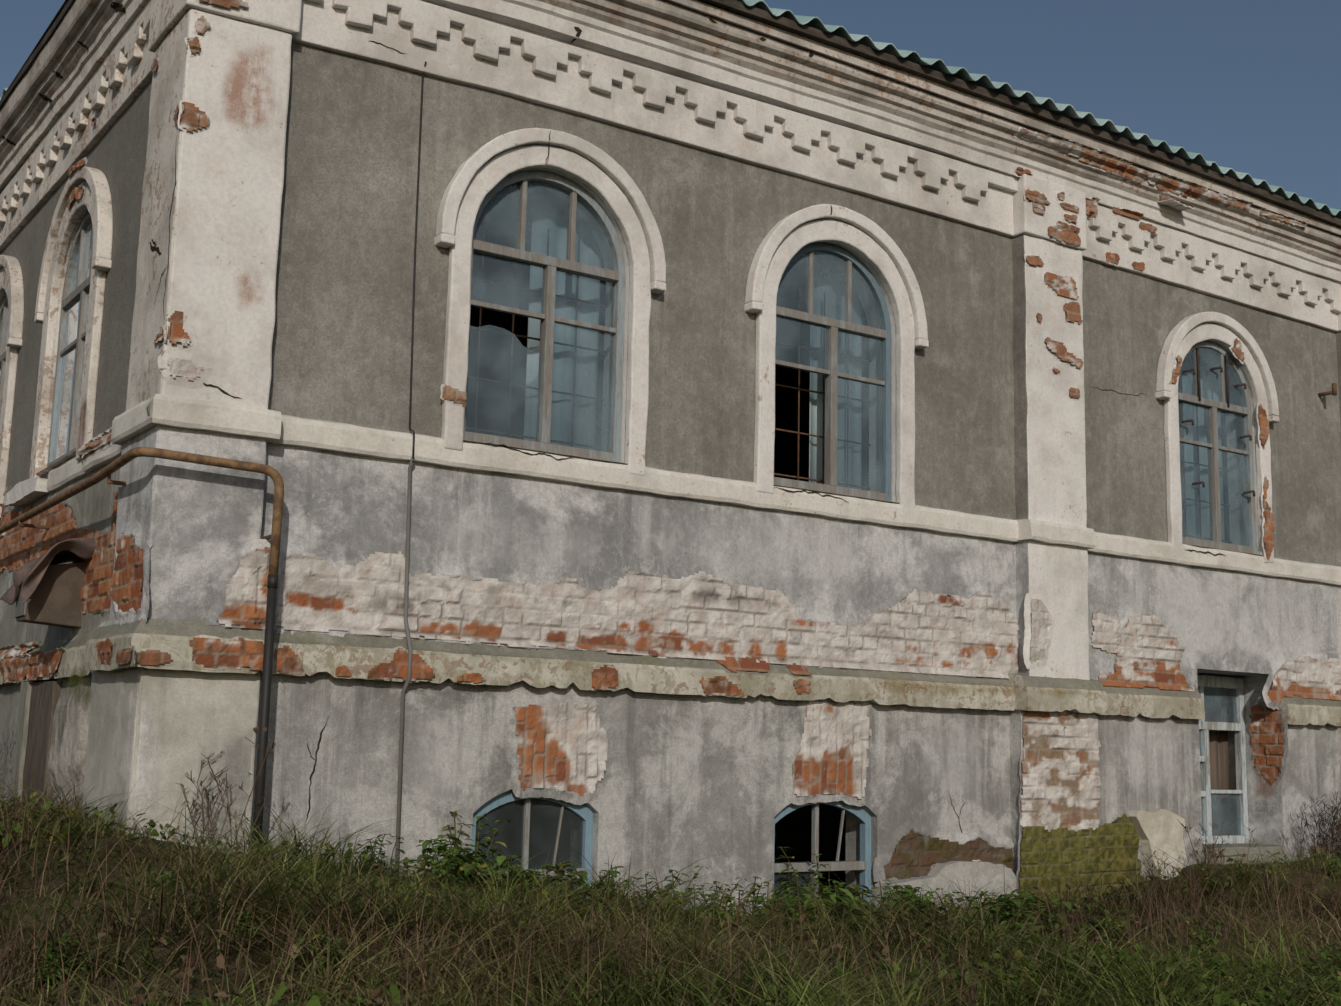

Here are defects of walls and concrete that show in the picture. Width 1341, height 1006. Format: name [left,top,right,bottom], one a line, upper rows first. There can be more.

peeling [173,100,210,134]
crack [149,148,176,313]
peeling [1014,166,1157,248]
flaking render [1014,127,1308,231]
peeling [1024,254,1083,324]
flaking render [0,485,154,627]
flaking render [205,539,1055,679]
flaking render [1088,604,1195,692]
flaking render [504,693,613,805]
flaking render [785,698,875,807]
flaking render [873,710,1151,905]
flaking render [1248,649,1341,788]